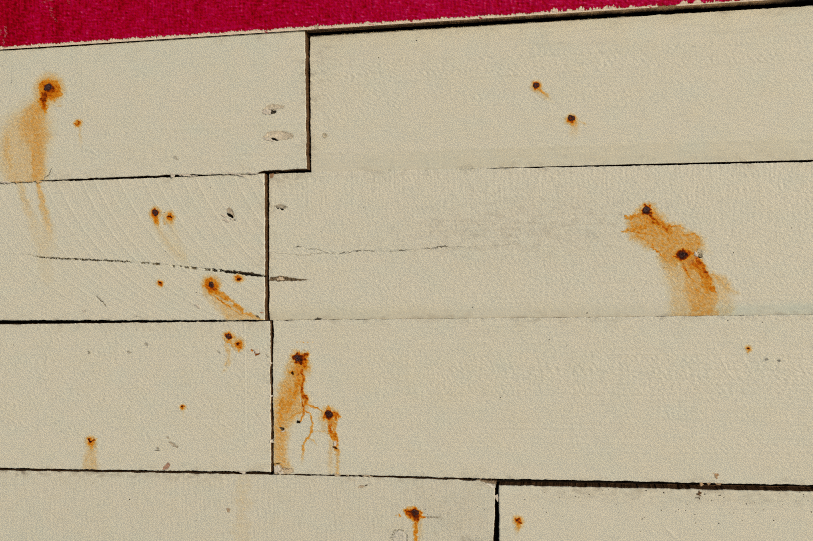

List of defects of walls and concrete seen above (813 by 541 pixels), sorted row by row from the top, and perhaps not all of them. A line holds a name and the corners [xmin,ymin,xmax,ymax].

rust [19,78,63,208]
rust [150,207,175,225]
crack [36,256,267,277]
rust [621,203,723,316]
rust [202,276,260,320]
rust [224,331,243,352]
rust [274,342,341,468]
rust [399,506,426,541]